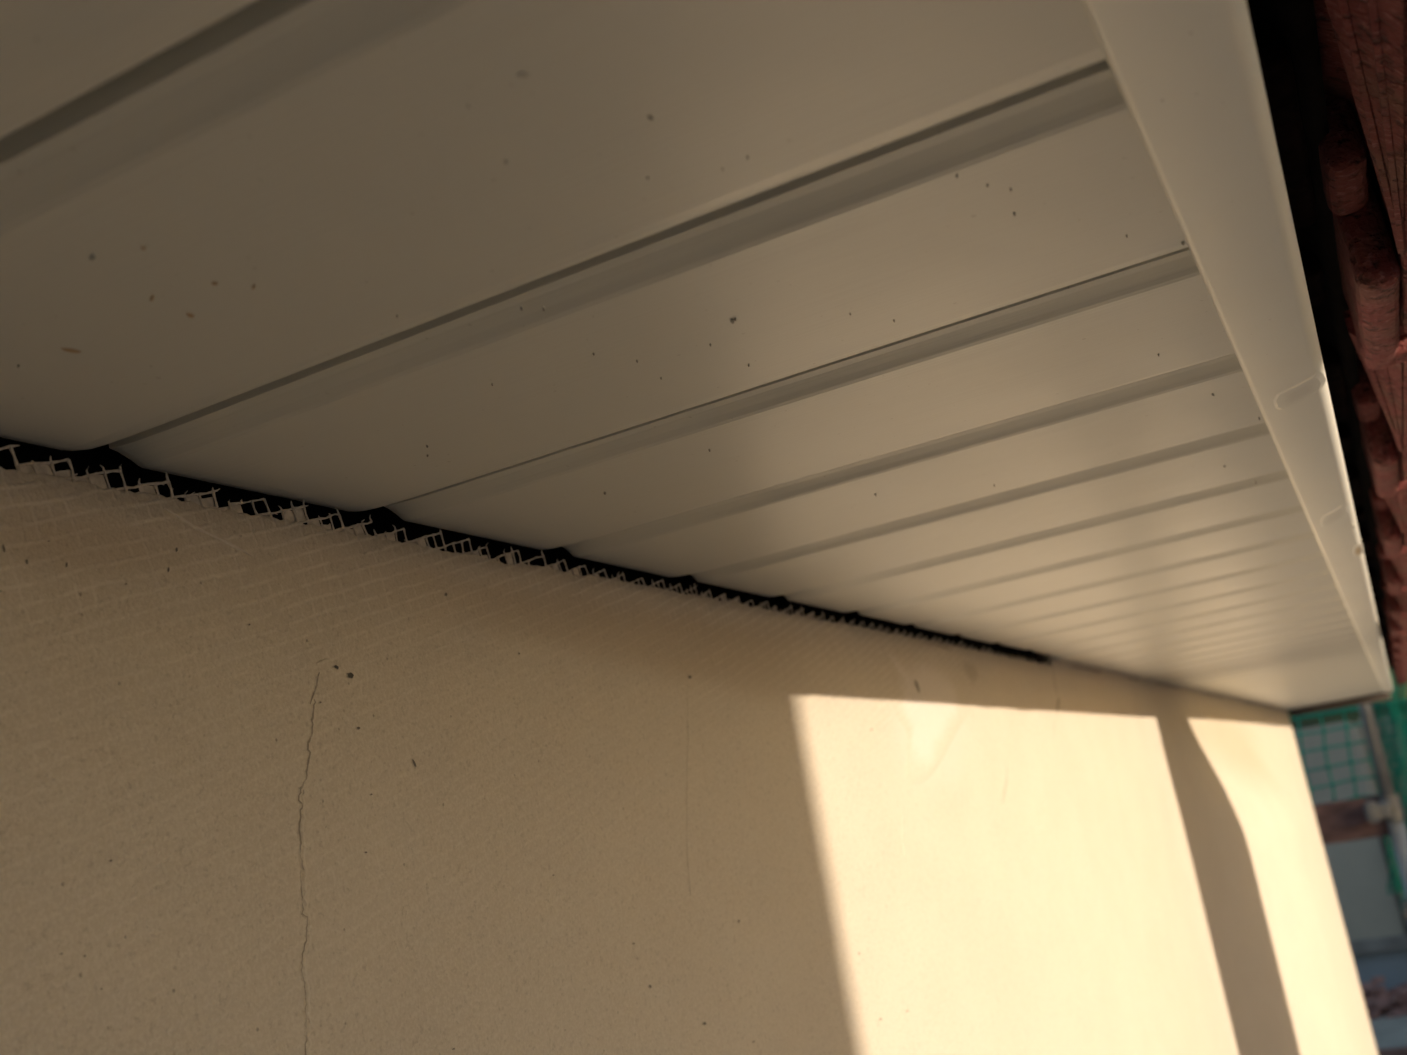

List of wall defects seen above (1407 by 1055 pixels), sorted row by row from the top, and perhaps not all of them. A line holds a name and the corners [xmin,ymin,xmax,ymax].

crack [297,658,329,1055]